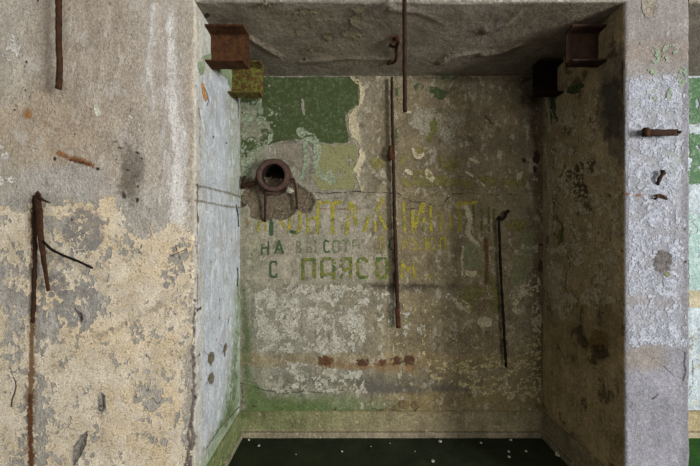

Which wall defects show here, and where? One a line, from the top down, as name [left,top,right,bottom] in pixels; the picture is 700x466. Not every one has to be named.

corrosion [56,150,94,168]
peeling [240,76,386,222]
peeling [400,76,526,197]
peeling [460,204,480,278]
peeling [628,45,700,348]
peeling [0,191,197,466]
corrosion [316,355,334,366]
corrosion [356,355,419,367]
peeling [254,260,543,404]